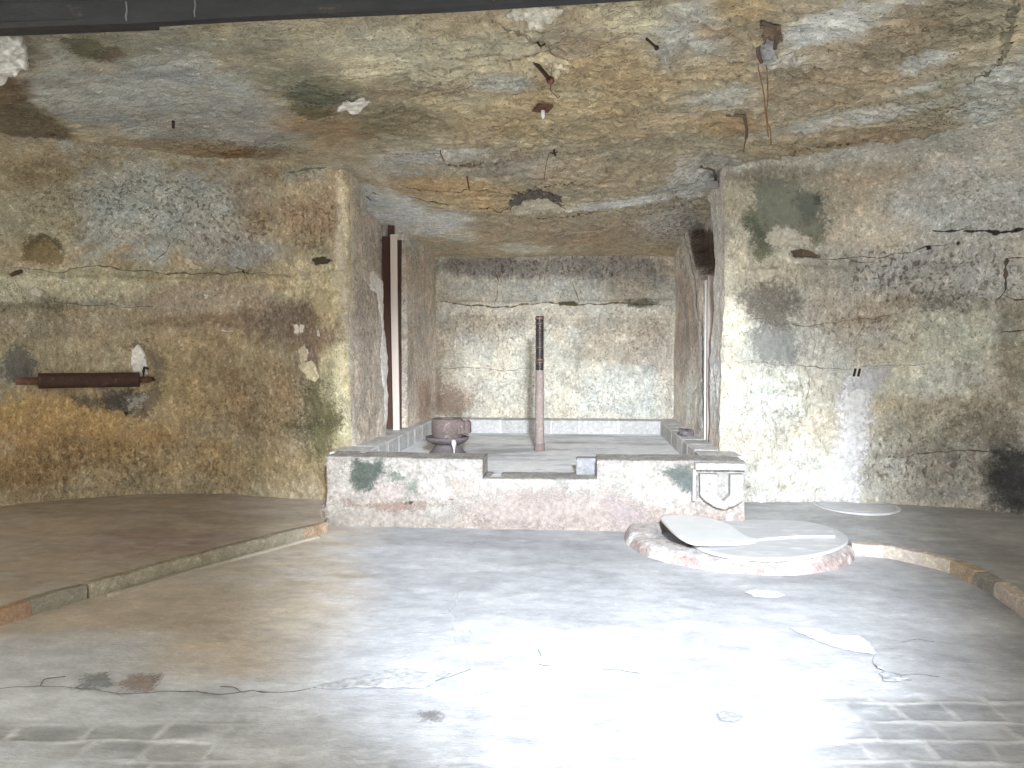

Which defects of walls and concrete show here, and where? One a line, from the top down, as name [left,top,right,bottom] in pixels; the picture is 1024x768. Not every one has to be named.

damp [290,98,372,121]
spalling [509,189,566,216]
crack [7,242,279,276]
damp [745,215,774,263]
crack [821,227,1024,302]
crack [436,273,667,308]
peeling [298,205,389,425]
damp [980,442,1024,515]
spalling [790,627,910,681]
crack [0,676,311,695]